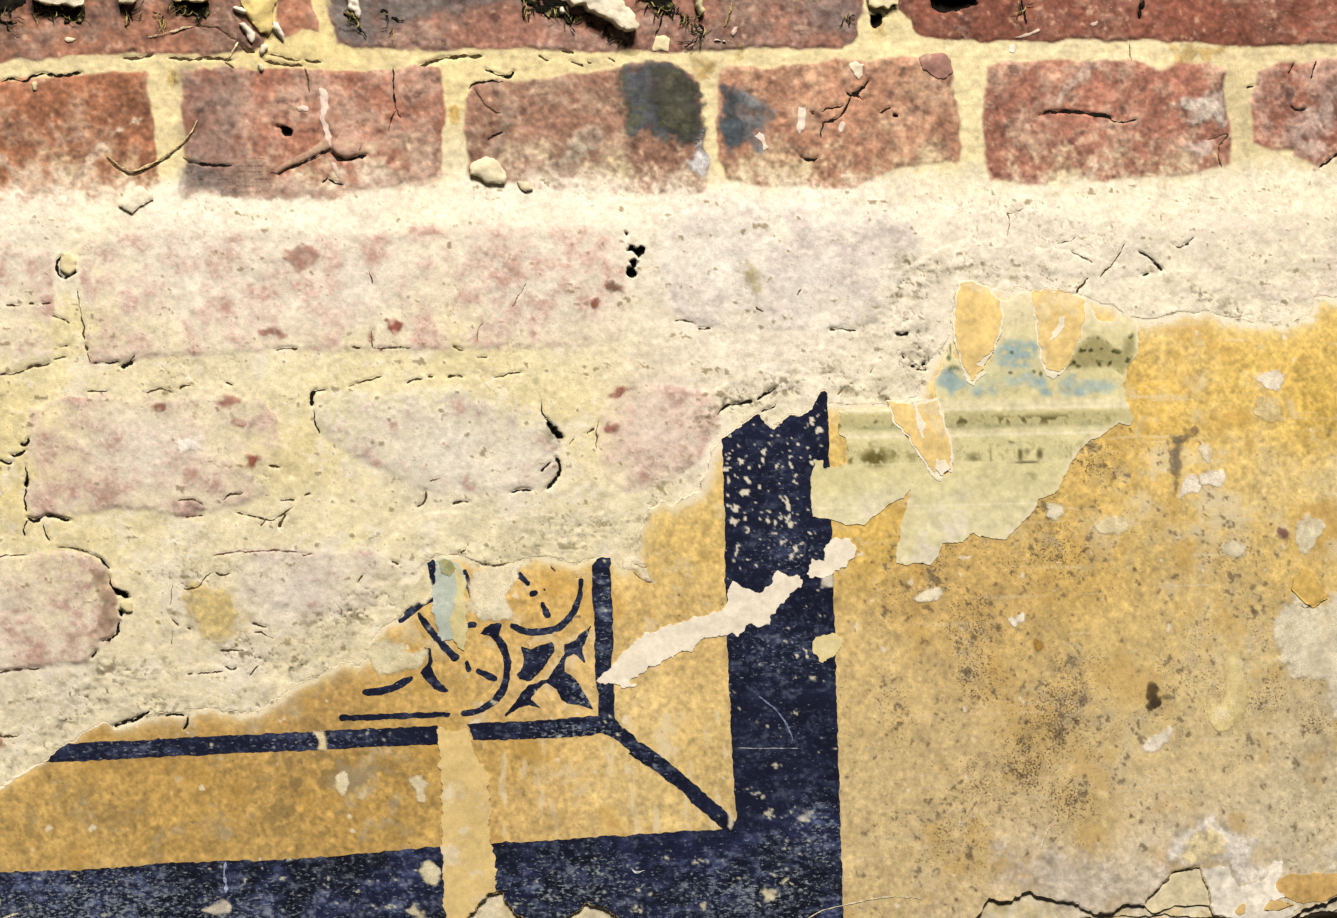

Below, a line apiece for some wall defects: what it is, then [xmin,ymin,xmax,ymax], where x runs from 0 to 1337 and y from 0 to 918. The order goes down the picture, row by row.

peeling [919,53,953,79]
crack [1038,109,1136,123]
spalling [626,246,645,278]
crack [0,256,190,393]
crack [310,324,520,433]
crack [0,438,120,657]
crack [170,492,313,643]
peeling [395,576,433,616]
peeling [467,563,521,621]
peeling [1273,593,1337,718]
crack [114,711,189,729]
peeling [313,731,327,750]